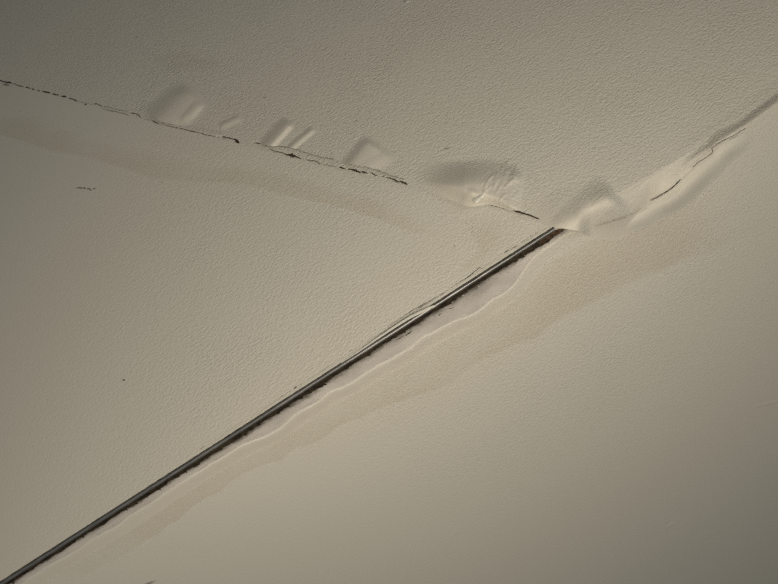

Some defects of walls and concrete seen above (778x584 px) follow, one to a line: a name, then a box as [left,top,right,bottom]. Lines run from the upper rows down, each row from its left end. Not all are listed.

crack [0,80,407,185]
crack [491,205,539,219]
crack [595,128,746,227]